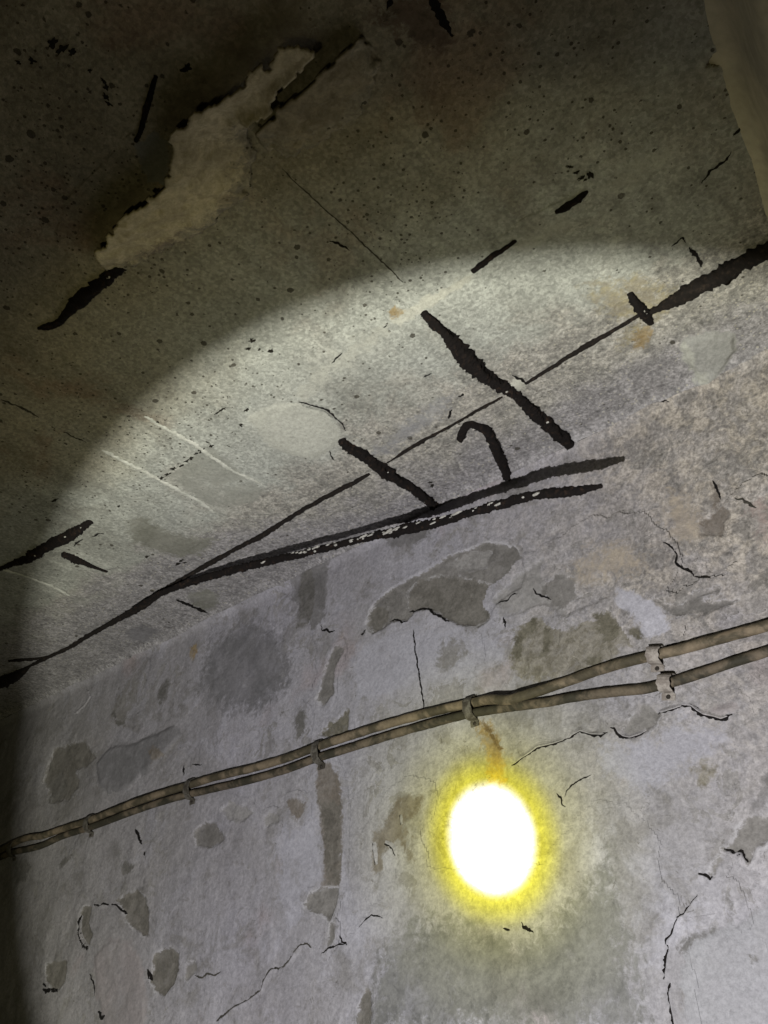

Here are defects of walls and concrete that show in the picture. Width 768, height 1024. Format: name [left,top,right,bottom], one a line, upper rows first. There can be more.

spalling [55,0,354,275]
crack [176,599,207,613]
crack [499,588,551,627]
crack [661,542,710,582]
crack [390,608,449,709]
rust [462,705,523,804]
crack [511,701,733,766]
crack [217,914,382,1024]
crack [662,849,749,1024]